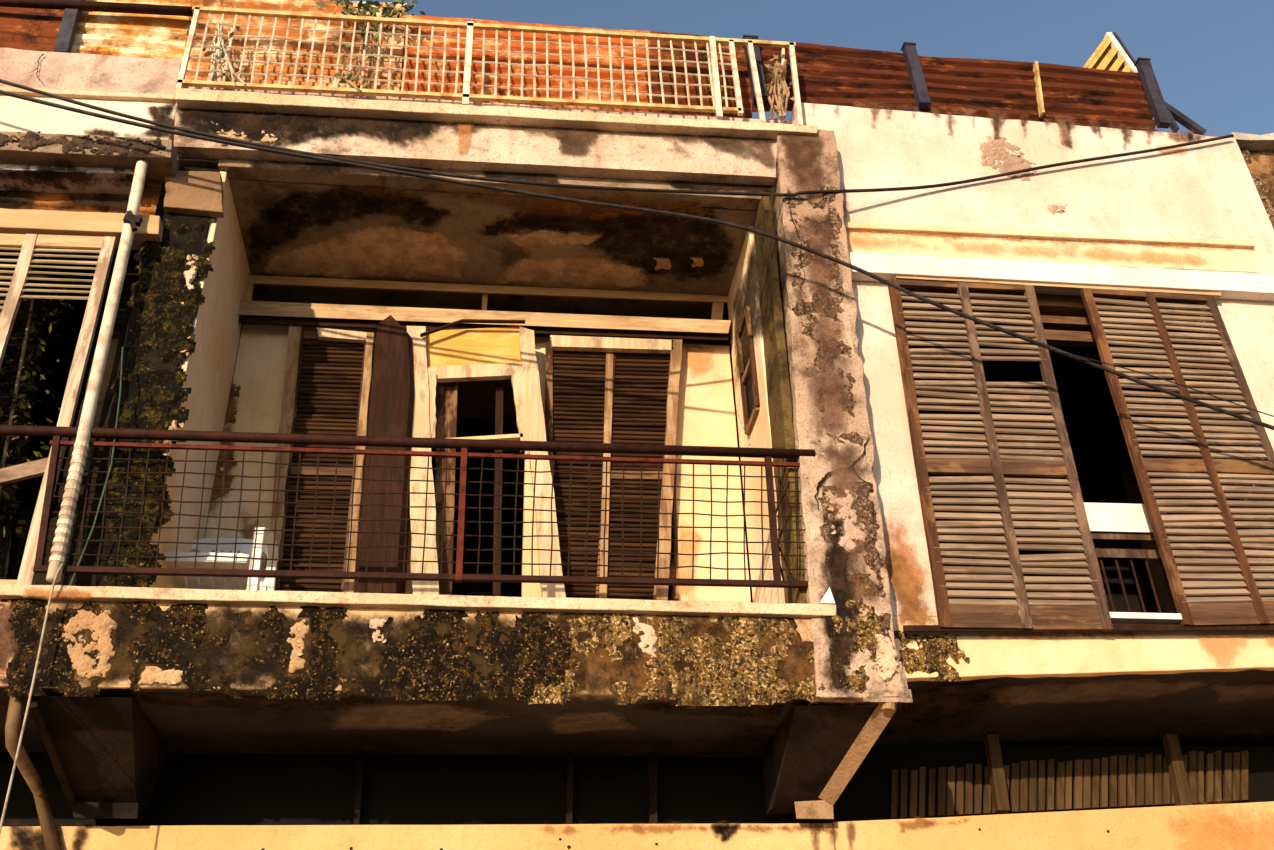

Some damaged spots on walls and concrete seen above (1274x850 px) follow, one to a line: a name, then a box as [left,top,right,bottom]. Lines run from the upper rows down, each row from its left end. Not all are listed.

water stain [0,170,163,211]
flaking render [0,131,166,158]
water stain [85,102,603,155]
water stain [248,160,774,281]
water stain [629,131,823,197]
peeling [978,136,1037,181]
spalling [781,186,864,446]
water stain [0,448,875,733]
spalling [818,481,899,683]
water stain [885,550,933,625]
flaking render [287,619,309,673]
flaking render [633,617,657,658]